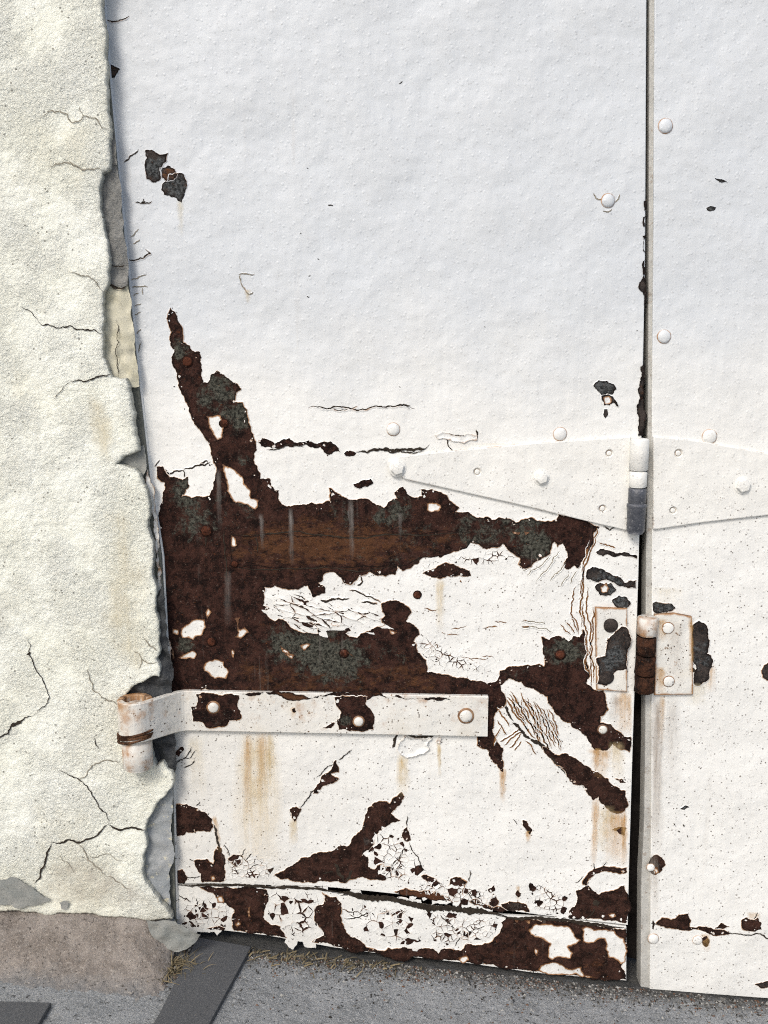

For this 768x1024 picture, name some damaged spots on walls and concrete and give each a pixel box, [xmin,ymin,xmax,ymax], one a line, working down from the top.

crack [23,198,153,399]
crack [308,404,414,413]
peeling [592,379,619,419]
crack [0,637,49,738]
peeling [120,445,162,590]
peeling [274,575,382,632]
peeling [353,478,374,490]
rust [156,307,638,783]
crack [262,528,615,774]
crack [35,737,143,889]
rust [542,746,629,836]
rust [274,791,632,981]